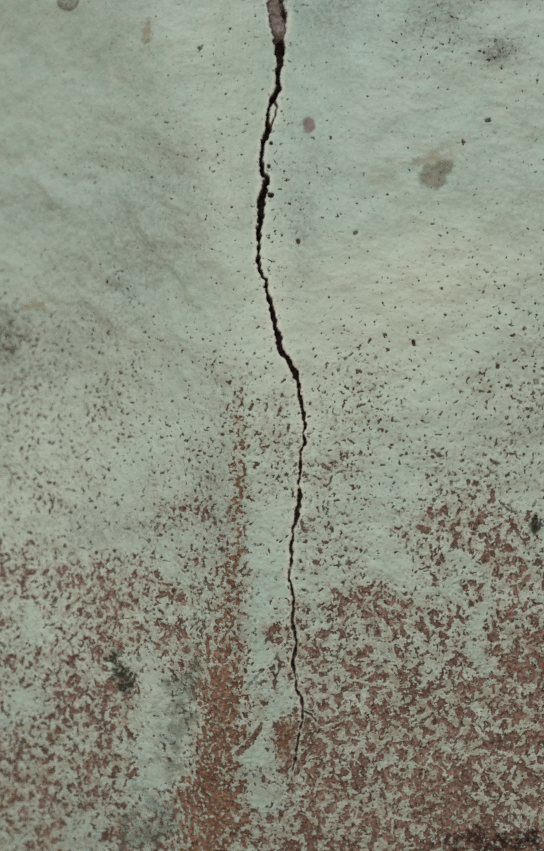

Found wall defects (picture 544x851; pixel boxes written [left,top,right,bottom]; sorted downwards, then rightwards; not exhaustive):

peeling [0,292,544,851]
crack [255,0,317,781]